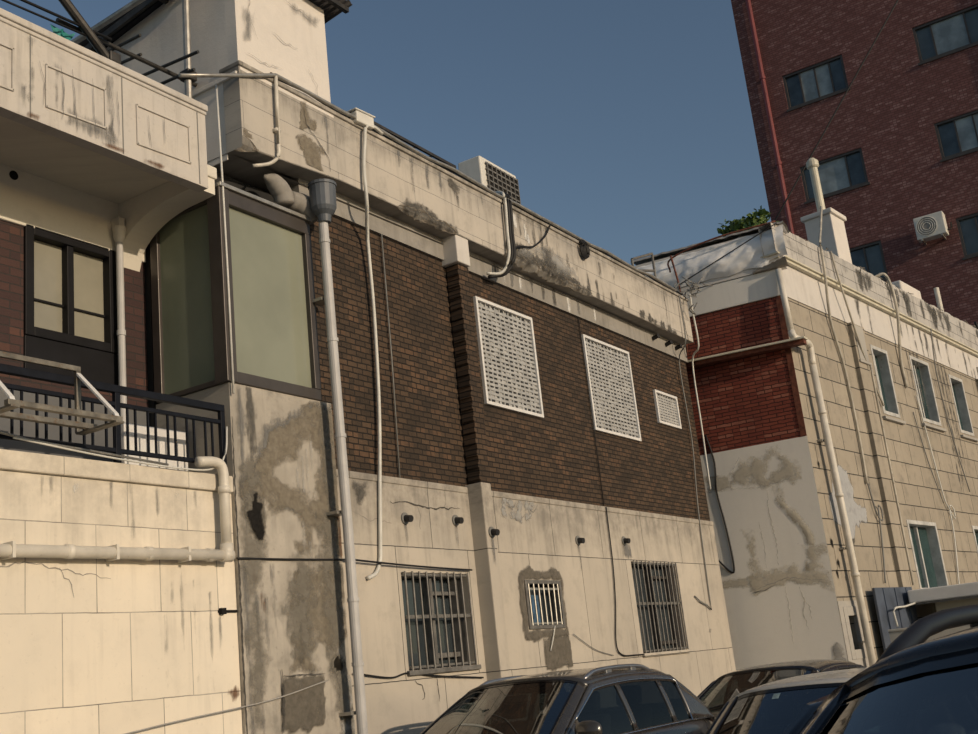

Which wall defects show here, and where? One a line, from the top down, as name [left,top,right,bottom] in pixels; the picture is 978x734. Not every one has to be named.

peeling [296,102,331,172]
leakage [426,166,459,201]
leakage [494,266,580,314]
leakage [856,269,872,314]
leakage [887,287,963,430]
spalling [240,402,340,554]
crack [0,561,111,596]
spalling [290,566,347,672]
peeling [341,679,355,734]